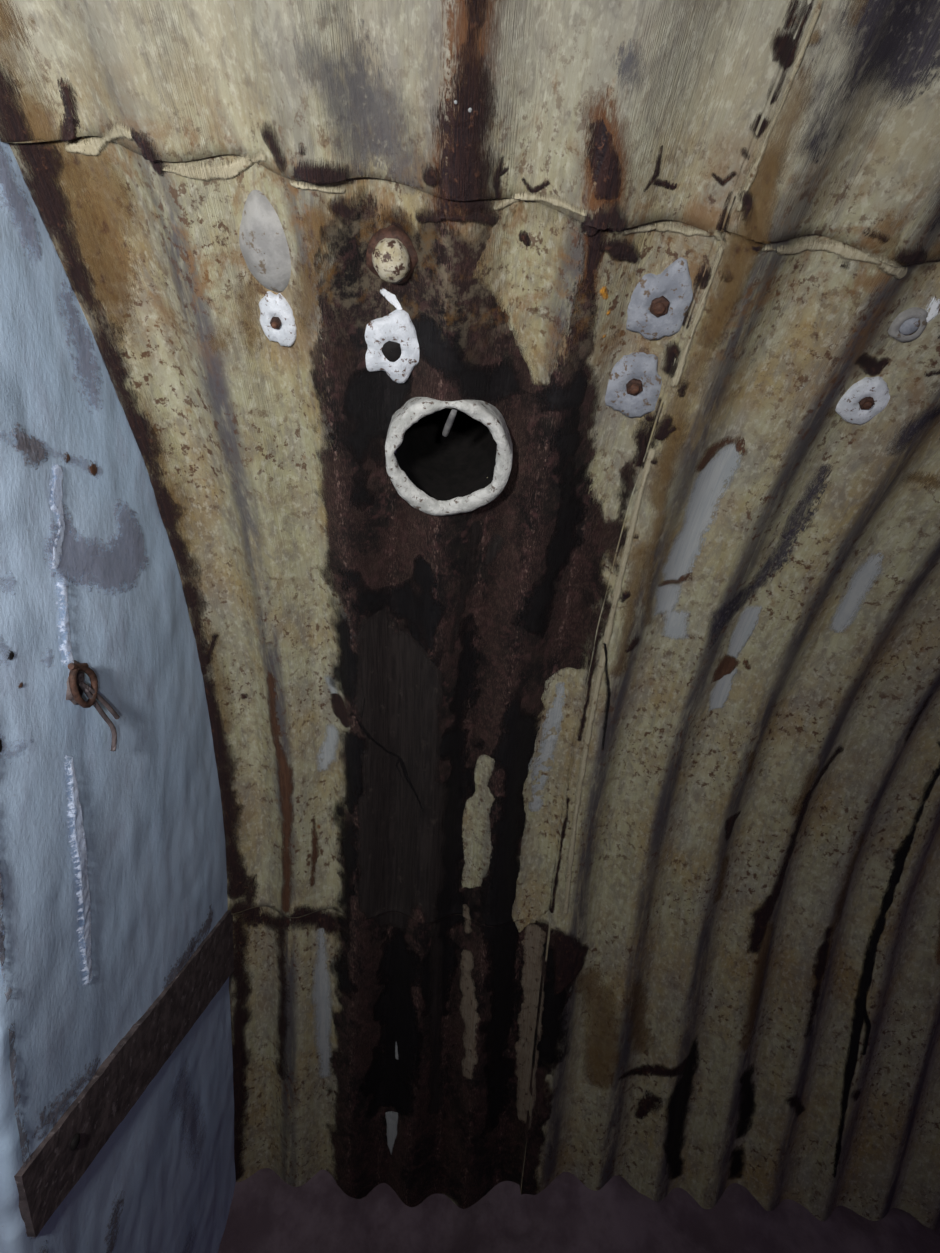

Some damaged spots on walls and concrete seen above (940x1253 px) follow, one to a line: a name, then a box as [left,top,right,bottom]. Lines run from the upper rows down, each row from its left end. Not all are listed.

leakage [0,147,41,258]
corrosion [682,0,823,348]
corrosion [0,0,701,1209]
peeling [512,0,908,1129]
corrosion [714,810,741,903]
crack [832,741,940,1178]